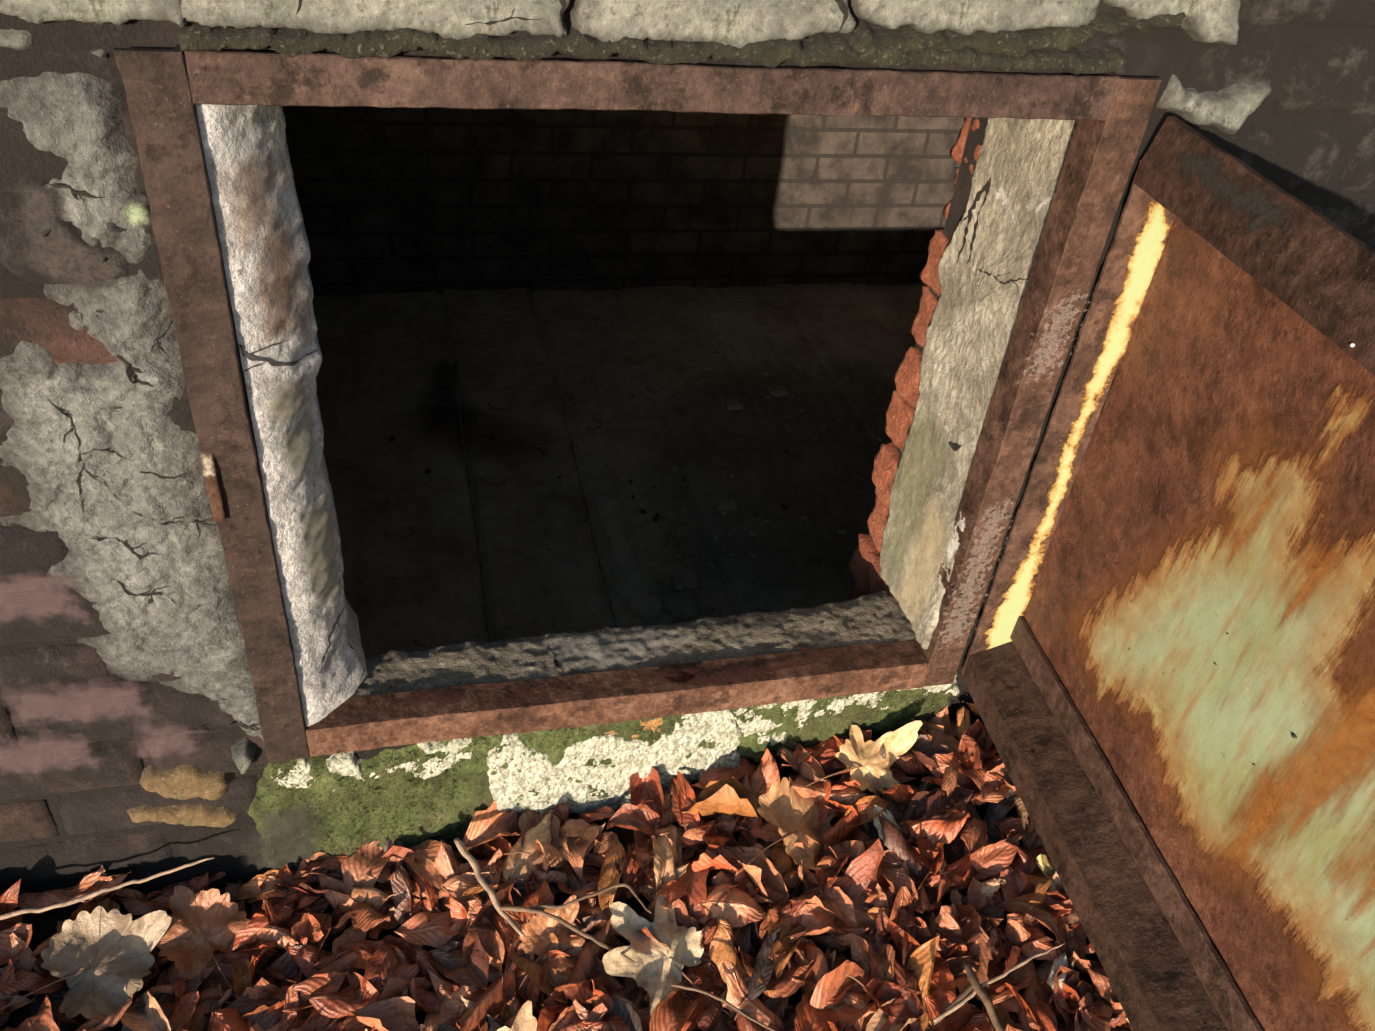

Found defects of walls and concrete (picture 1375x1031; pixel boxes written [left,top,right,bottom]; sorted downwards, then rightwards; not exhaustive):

rust [238,156,274,246]
peeling [270,381,313,474]
crack [42,392,214,609]
rust [648,645,841,686]
flaking render [127,765,241,828]